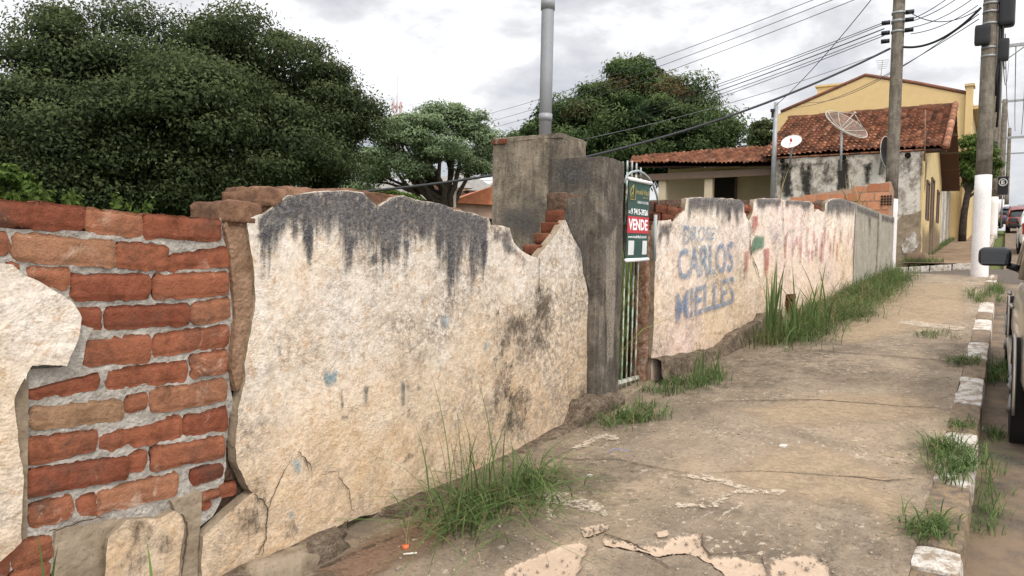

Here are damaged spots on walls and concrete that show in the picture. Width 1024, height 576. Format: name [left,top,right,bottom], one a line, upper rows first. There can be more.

damp [258,191,538,297]
flaking render [523,192,588,256]
damp [688,159,895,232]
flaking render [0,199,253,576]
damp [494,285,553,436]
crack [254,451,403,555]